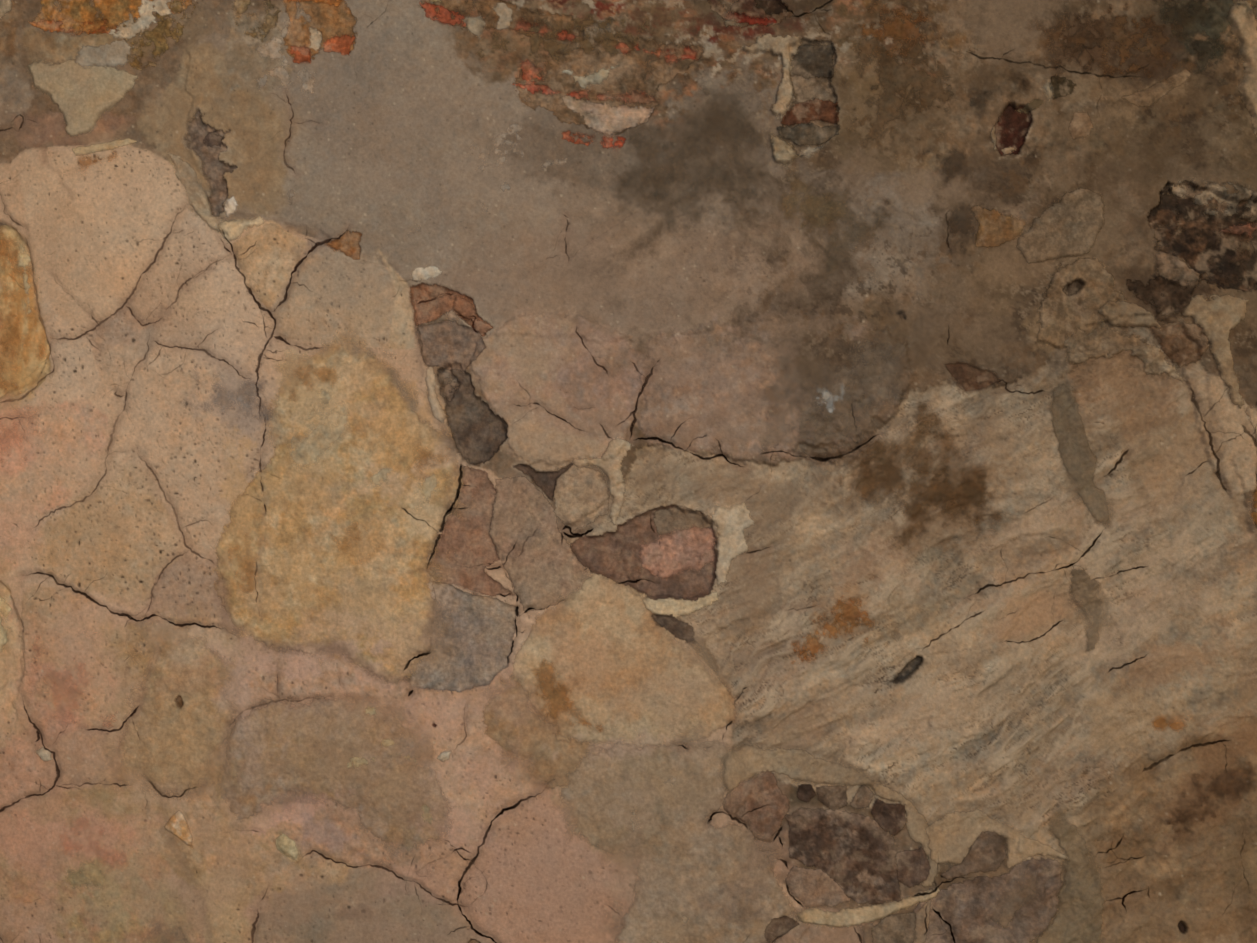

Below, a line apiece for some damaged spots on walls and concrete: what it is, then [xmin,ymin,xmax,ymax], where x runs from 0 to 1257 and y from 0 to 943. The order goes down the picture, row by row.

peeling [29,0,195,70]
peeling [233,0,357,64]
peeling [419,0,704,148]
leakage [525,13,649,64]
peeling [708,0,840,164]
leakage [853,8,954,146]
leakage [1046,0,1249,77]
crack [49,232,342,511]
crack [576,331,875,467]
crack [33,572,217,628]
crack [0,706,138,812]
crack [309,796,533,943]